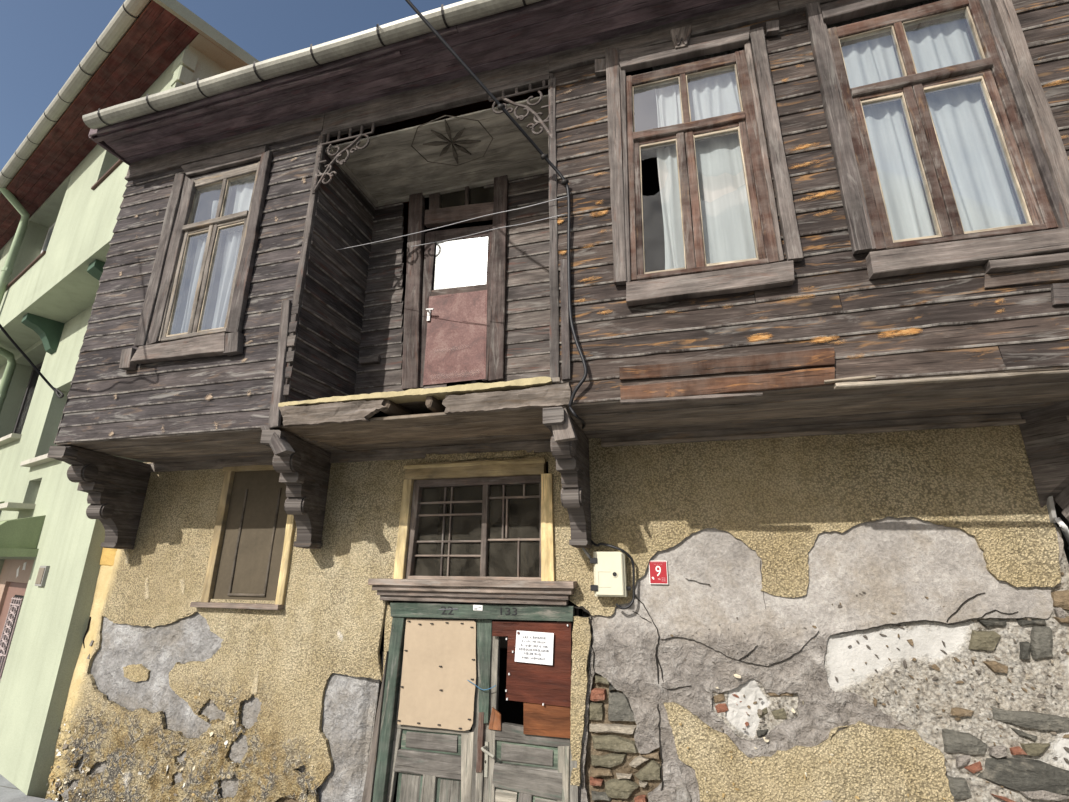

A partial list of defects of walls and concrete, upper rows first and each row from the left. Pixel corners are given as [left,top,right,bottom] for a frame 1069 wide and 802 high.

peeling [748,333,771,341]
peeling [878,328,921,338]
spalling [1055,527,1065,575]
flaking render [46,708,108,802]
spalling [87,612,262,802]
spalling [276,651,384,802]
spalling [579,516,1053,802]
crack [633,592,1019,791]